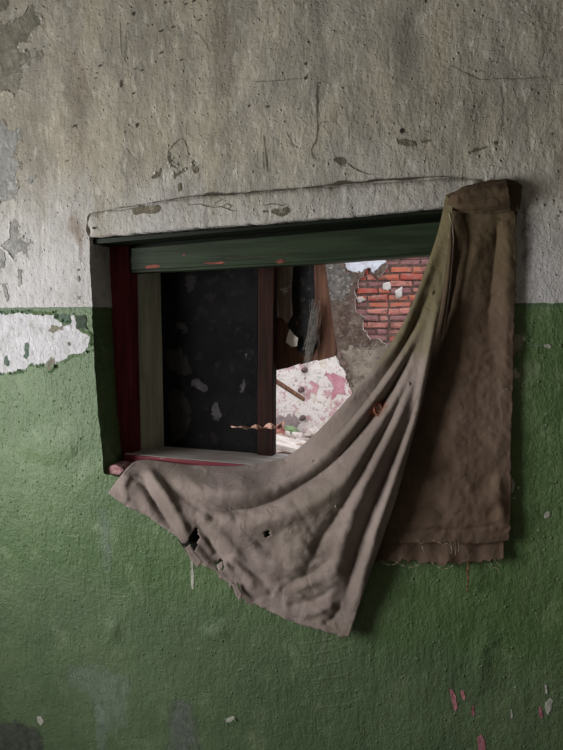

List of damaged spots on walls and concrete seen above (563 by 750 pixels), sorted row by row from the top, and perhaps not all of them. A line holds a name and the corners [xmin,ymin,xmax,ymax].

peeling [0,0,50,98]
peeling [0,118,42,206]
crack [86,164,468,236]
crack [250,78,328,160]
peeling [0,218,34,286]
peeling [0,284,93,376]
flaking render [309,257,430,399]
peeling [449,689,465,711]